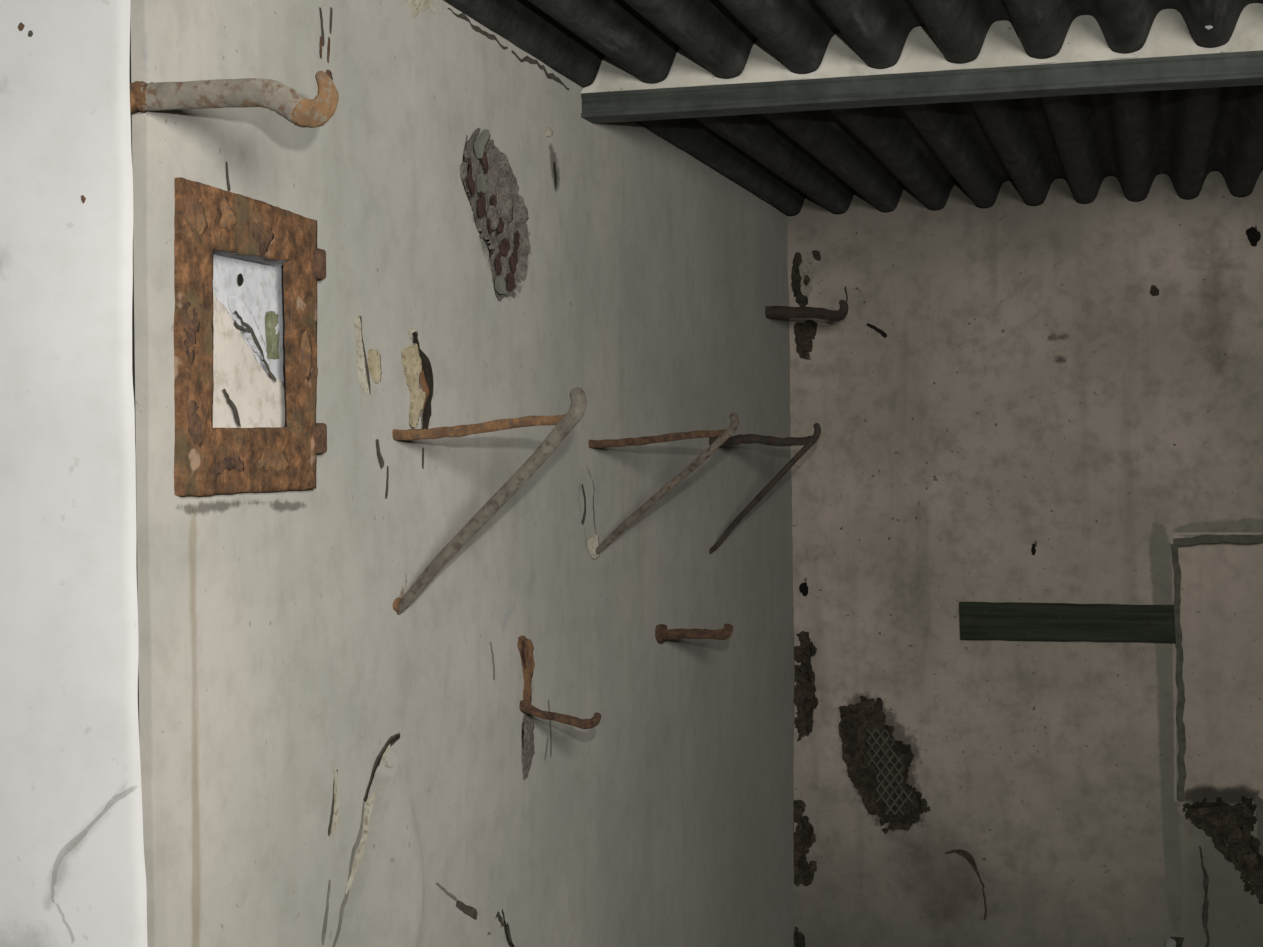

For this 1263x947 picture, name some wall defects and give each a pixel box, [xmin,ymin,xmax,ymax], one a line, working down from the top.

spalling [460,128,530,301]
spalling [791,250,821,360]
peeling [354,315,434,430]
peeling [376,439,389,499]
spalling [793,631,818,741]
spalling [839,695,930,834]
crack [322,732,400,947]
spalling [793,800,817,886]
spalling [1183,798,1263,904]
crack [436,882,515,947]